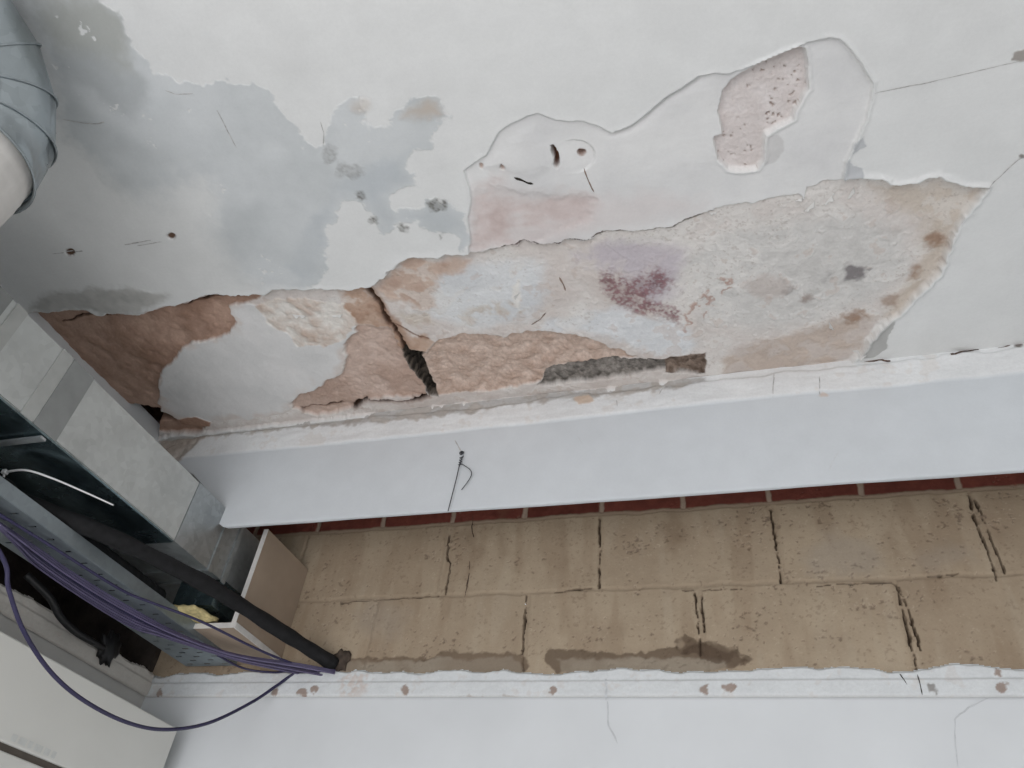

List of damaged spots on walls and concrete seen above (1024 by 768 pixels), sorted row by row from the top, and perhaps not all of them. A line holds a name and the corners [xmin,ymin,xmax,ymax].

water stain [12,0,472,296]
spalling [35,37,989,441]
water stain [566,234,695,327]
crack [301,287,438,412]
crack [395,515,474,600]
crack [555,518,602,593]
crack [769,508,782,584]
crack [967,495,1006,581]
crack [520,596,528,655]
water stain [544,633,754,674]
crack [682,588,742,643]
crack [817,582,922,693]